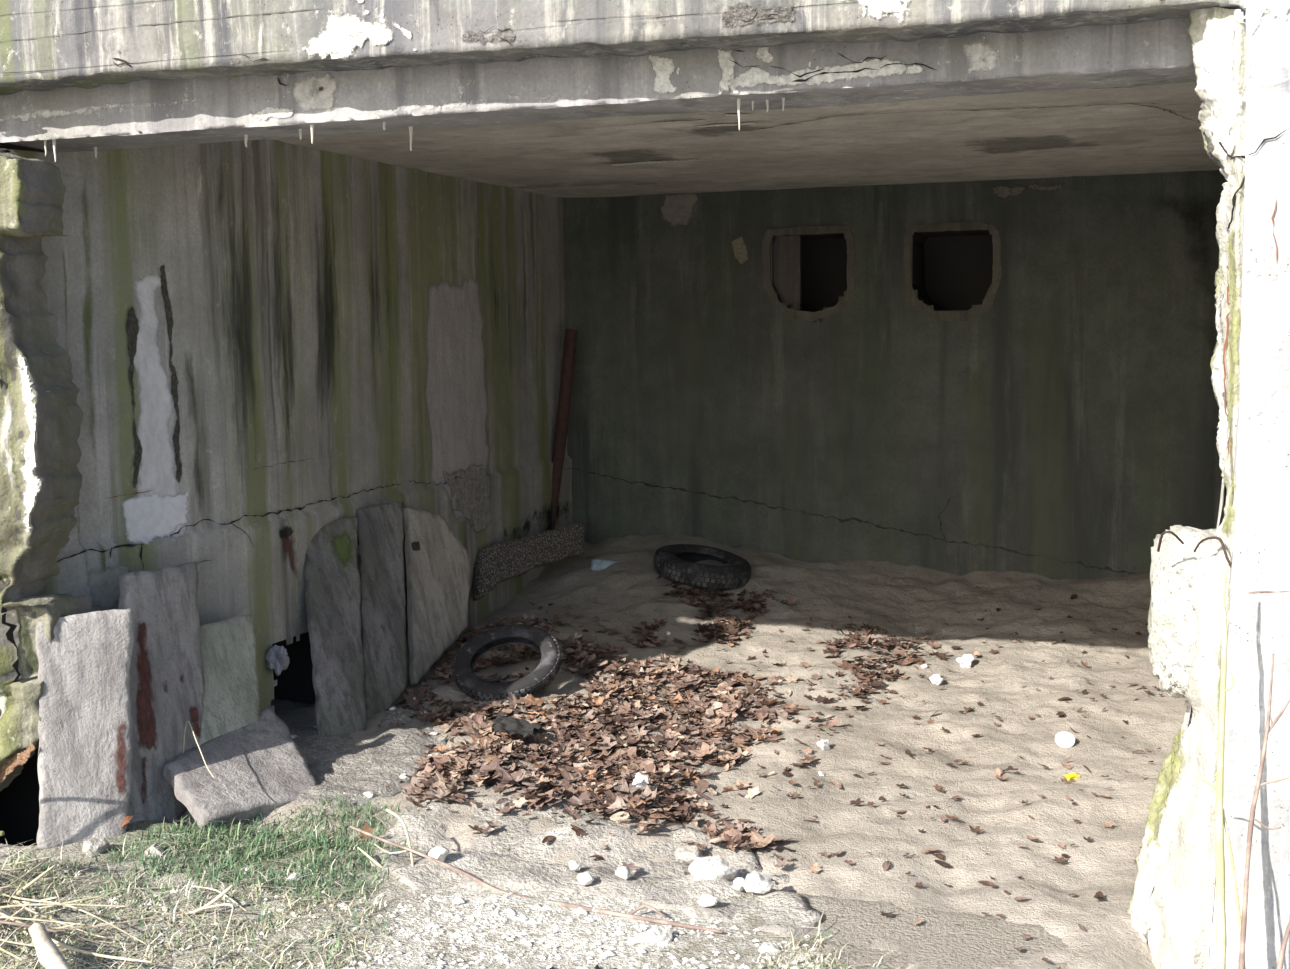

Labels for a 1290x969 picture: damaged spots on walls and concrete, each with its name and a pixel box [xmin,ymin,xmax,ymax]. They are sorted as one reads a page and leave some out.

peeling [303,0,416,60]
crack [0,143,45,158]
leakage [1,399,13,477]
peeling [18,355,42,532]
peeling [123,265,188,544]
leakage [231,224,254,417]
crack [56,476,462,567]
leakage [274,237,293,428]
leakage [318,237,334,383]
crack [563,468,1141,575]
peeling [1211,292,1230,481]
crack [1222,266,1230,460]